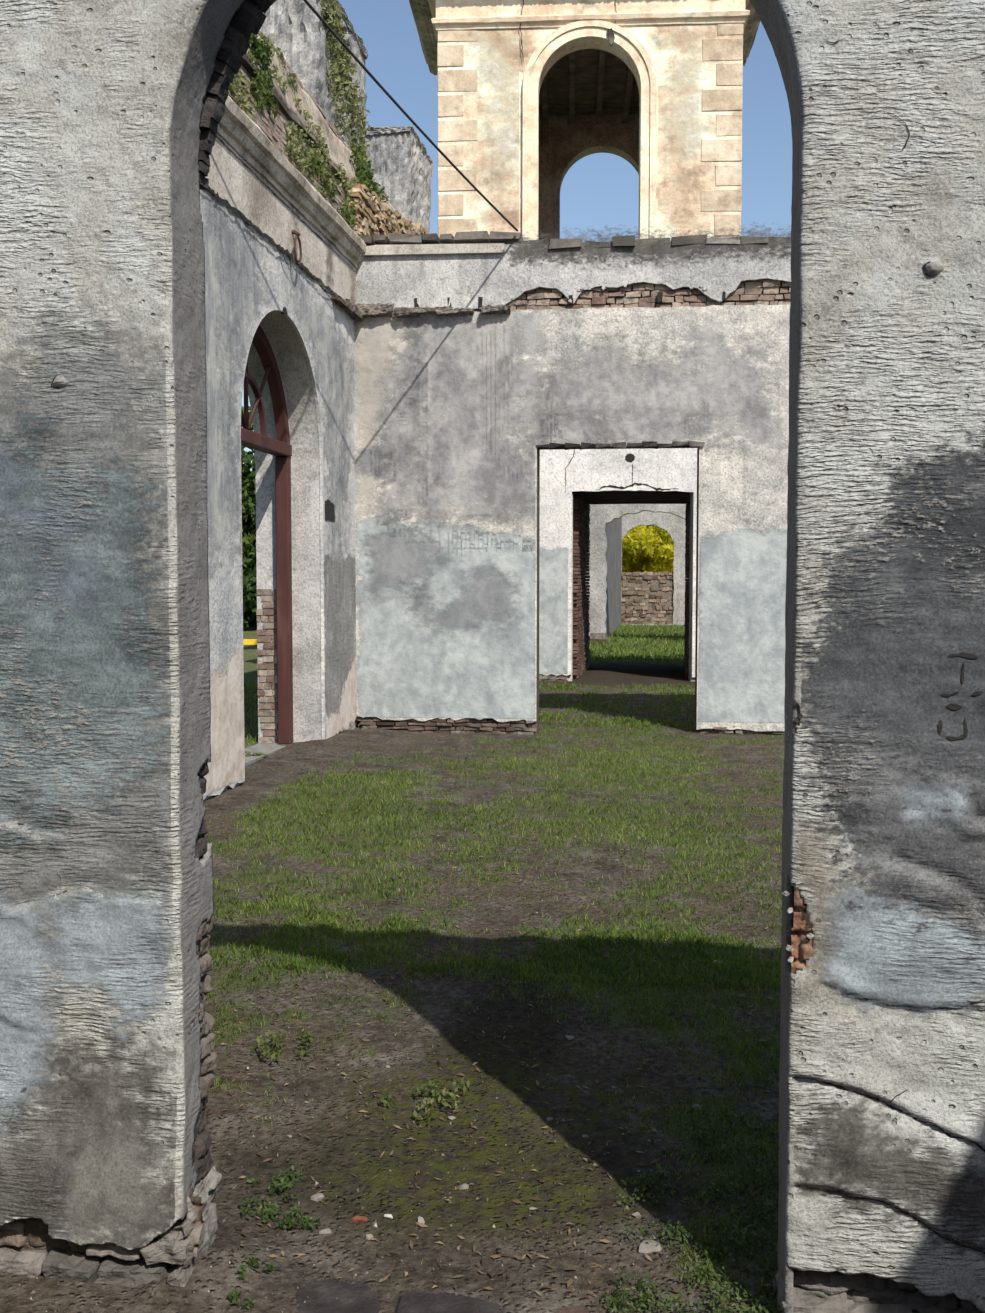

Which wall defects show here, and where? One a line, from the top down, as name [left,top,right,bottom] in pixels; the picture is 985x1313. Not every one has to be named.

flaking render [198,0,276,190]
flaking render [331,278,791,321]
leakage [290,269,786,632]
crack [598,464,677,491]
leakage [0,310,173,920]
flaking render [198,589,278,797]
leakage [801,420,985,961]
flaking render [782,882,820,974]
crack [832,984,985,1010]
crack [796,1077,985,1152]
crack [842,1193,985,1254]
flaking render [793,1269,983,1313]